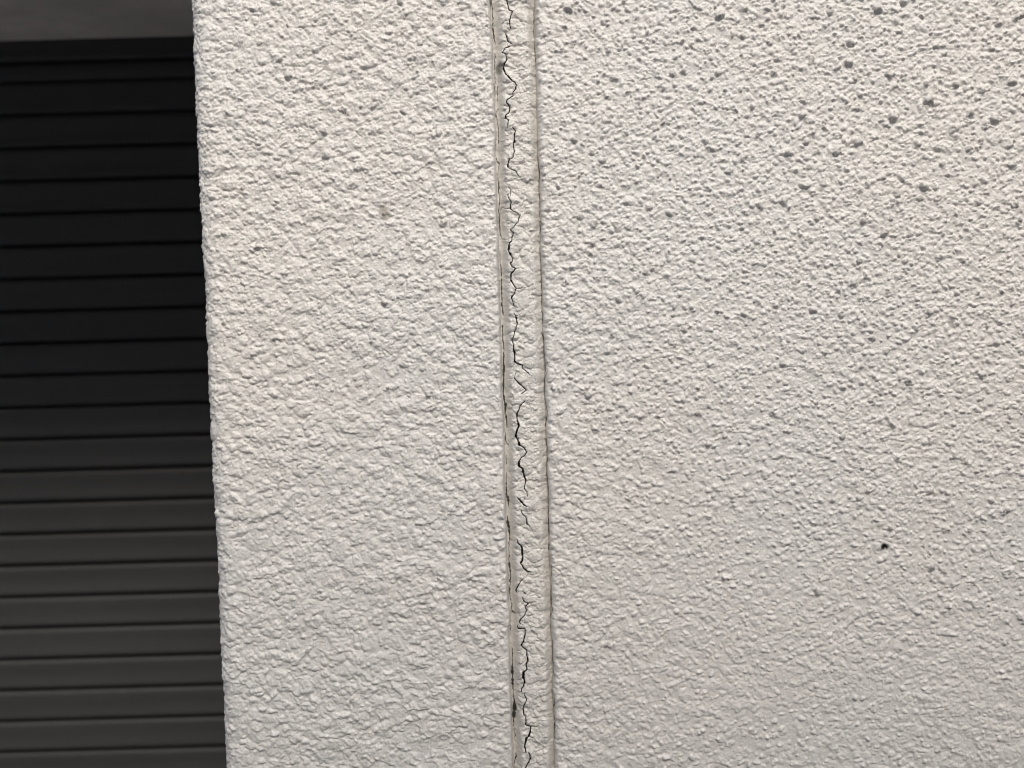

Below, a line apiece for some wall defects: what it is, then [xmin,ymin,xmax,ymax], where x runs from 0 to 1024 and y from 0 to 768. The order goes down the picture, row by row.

crack [487,0,555,768]